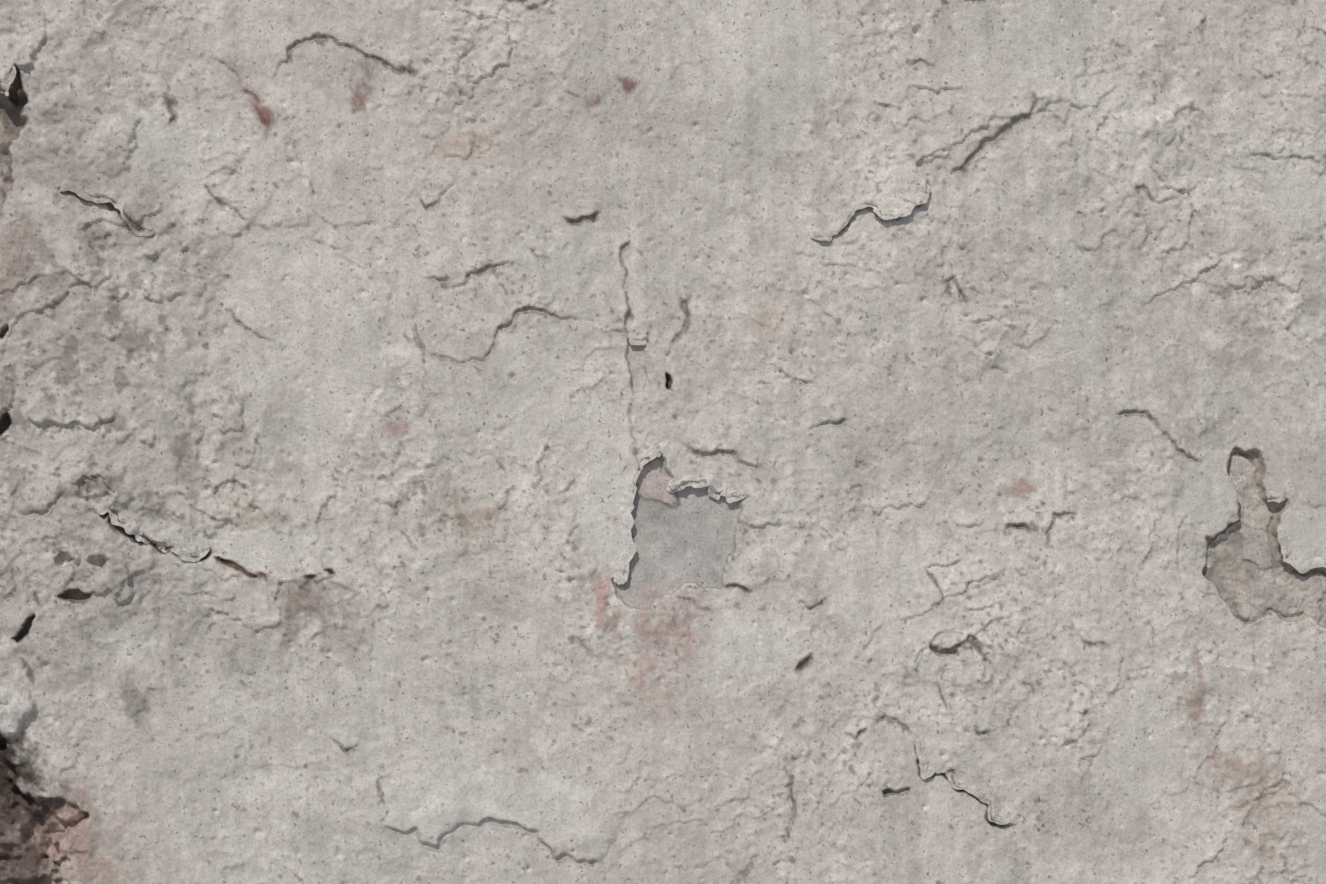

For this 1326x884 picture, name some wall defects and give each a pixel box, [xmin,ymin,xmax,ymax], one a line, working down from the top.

spalling [0,63,28,209]
crack [969,94,1037,158]
crack [675,298,690,340]
spalling [0,412,12,436]
crack [91,501,266,578]
flaking render [611,435,750,610]
flaking render [1202,448,1326,628]
spalling [13,615,35,643]
spalling [57,589,94,604]
crack [939,635,981,704]
flaking render [0,733,89,884]
crack [915,728,1020,827]